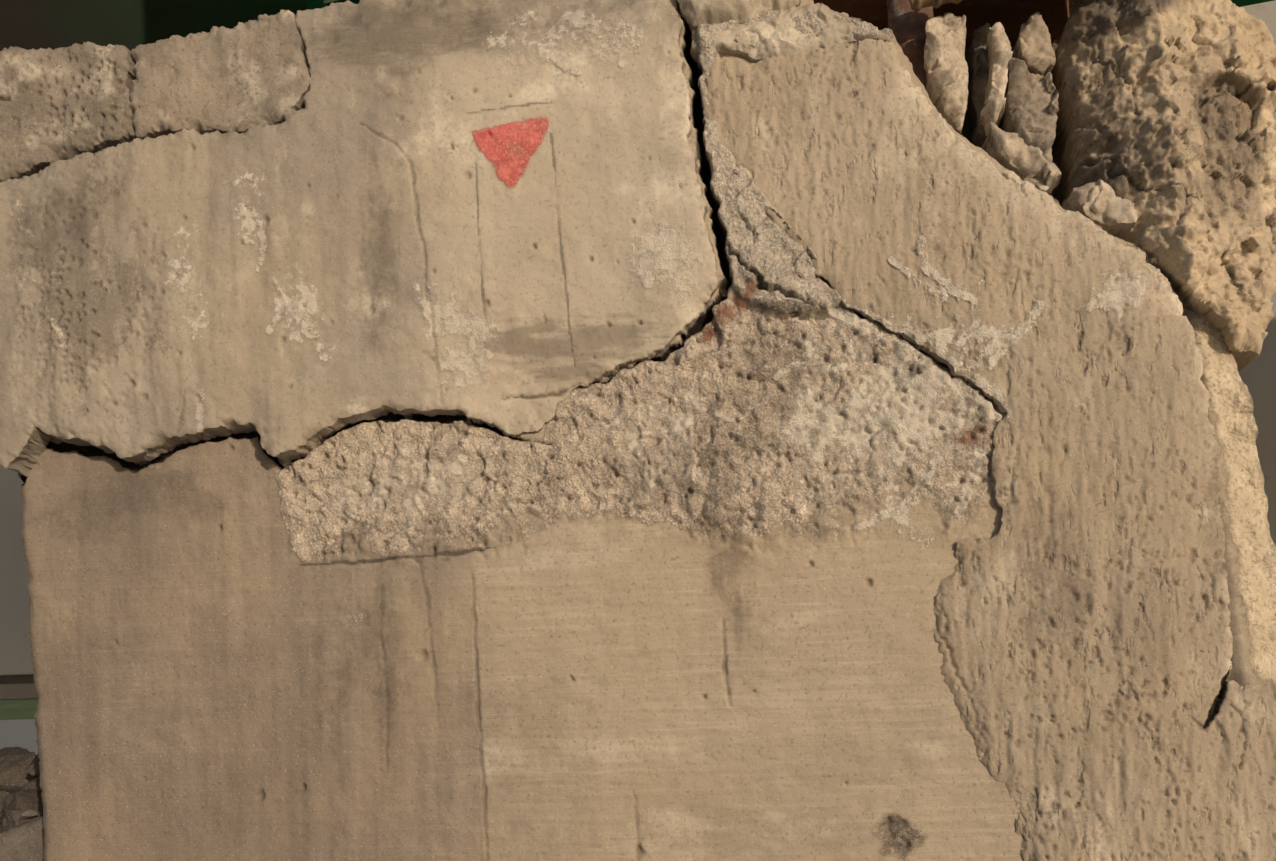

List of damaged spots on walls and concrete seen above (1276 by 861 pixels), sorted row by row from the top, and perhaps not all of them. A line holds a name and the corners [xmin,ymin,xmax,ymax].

spalling [910,0,1059,162]
damp [225,171,267,272]
crack [515,9,998,410]
spalling [1061,179,1138,235]
damp [265,263,336,361]
damp [413,279,501,389]
spalling [275,9,998,563]
crack [46,412,552,473]
damp [773,235,1045,550]
crack [1203,667,1247,769]